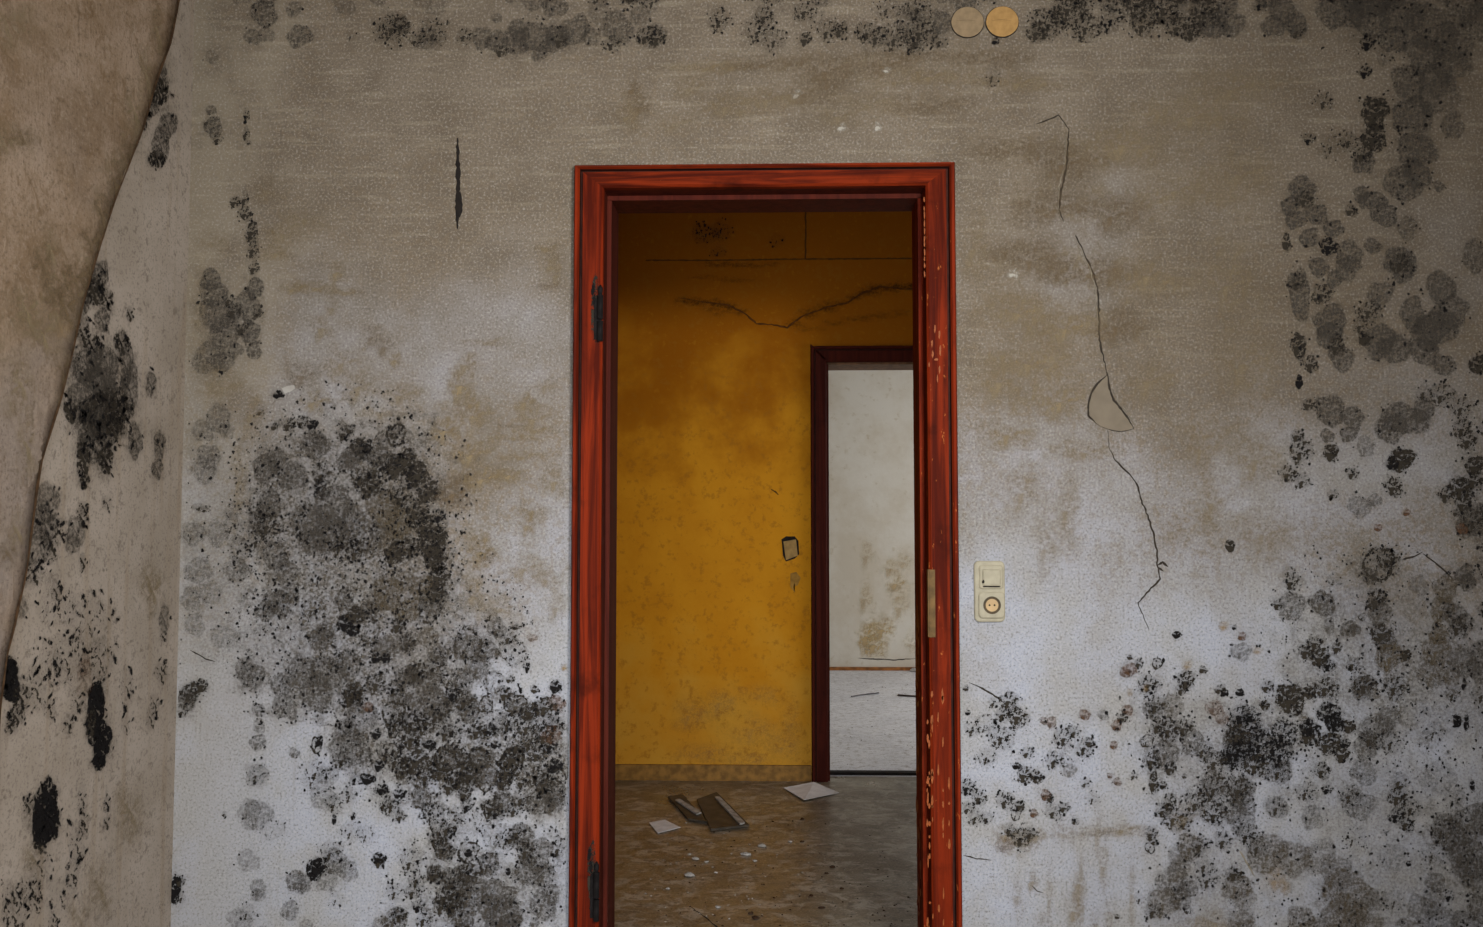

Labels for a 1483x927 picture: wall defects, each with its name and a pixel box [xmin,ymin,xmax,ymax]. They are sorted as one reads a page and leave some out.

damp [349,0,670,60]
damp [706,0,996,67]
crack [1037,114,1107,375]
damp [1,194,568,927]
spalling [1087,373,1135,432]
crack [1107,430,1168,629]
damp [961,0,1483,927]
damp [587,840,595,909]